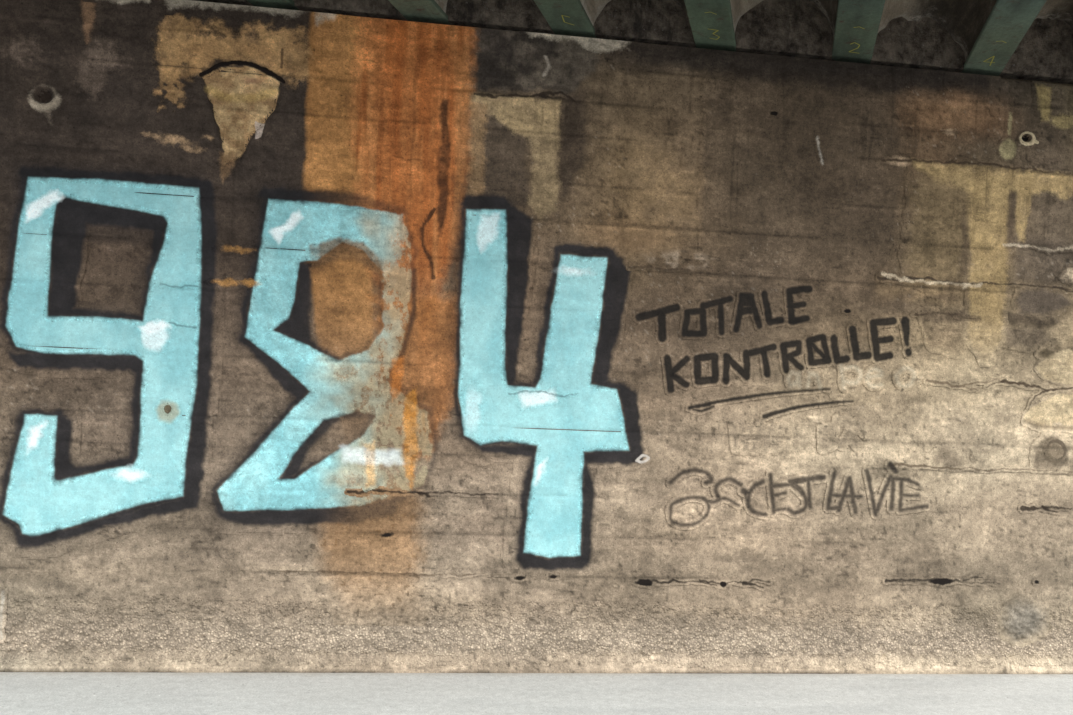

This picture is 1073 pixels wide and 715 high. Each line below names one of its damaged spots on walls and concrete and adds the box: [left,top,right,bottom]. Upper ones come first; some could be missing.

peeling [76,0,100,47]
peeling [131,11,319,188]
corrosion [299,15,485,494]
crack [923,373,1073,413]
corrosion [304,500,444,626]